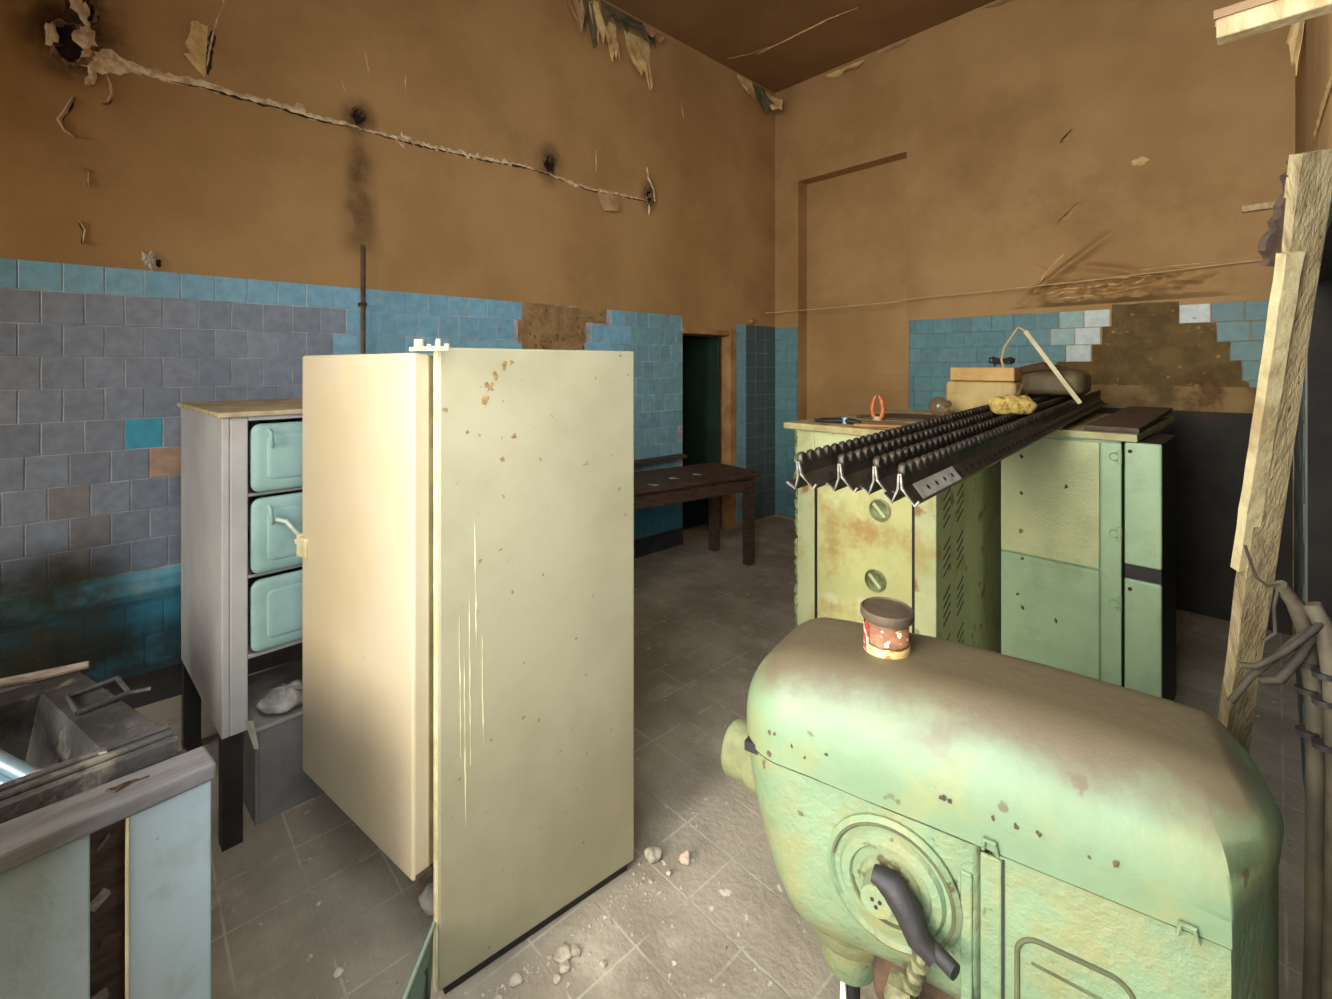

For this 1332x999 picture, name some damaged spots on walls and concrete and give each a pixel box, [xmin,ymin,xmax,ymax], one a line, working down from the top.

flaking render [43,0,149,139]
crack [85,0,649,214]
peeling [565,0,669,91]
peeling [737,74,783,115]
peeling [515,302,607,350]
peeling [1056,301,1257,413]